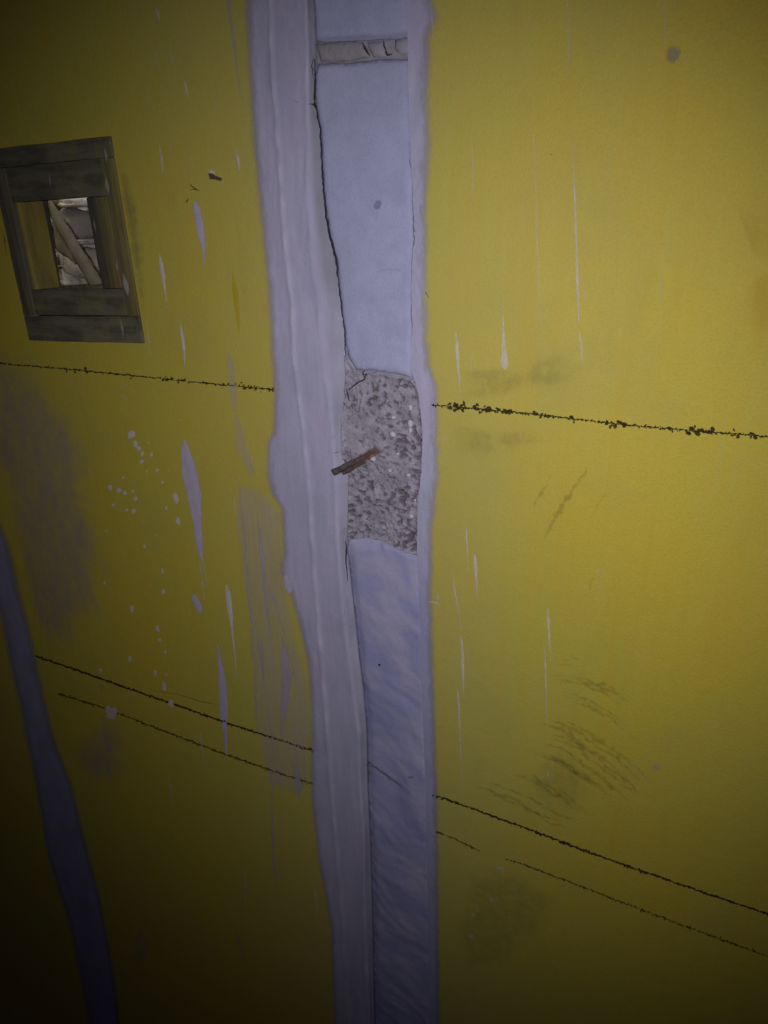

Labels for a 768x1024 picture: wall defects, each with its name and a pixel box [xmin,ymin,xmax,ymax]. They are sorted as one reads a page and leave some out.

crack [311,59,367,401]
spalling [340,356,423,556]